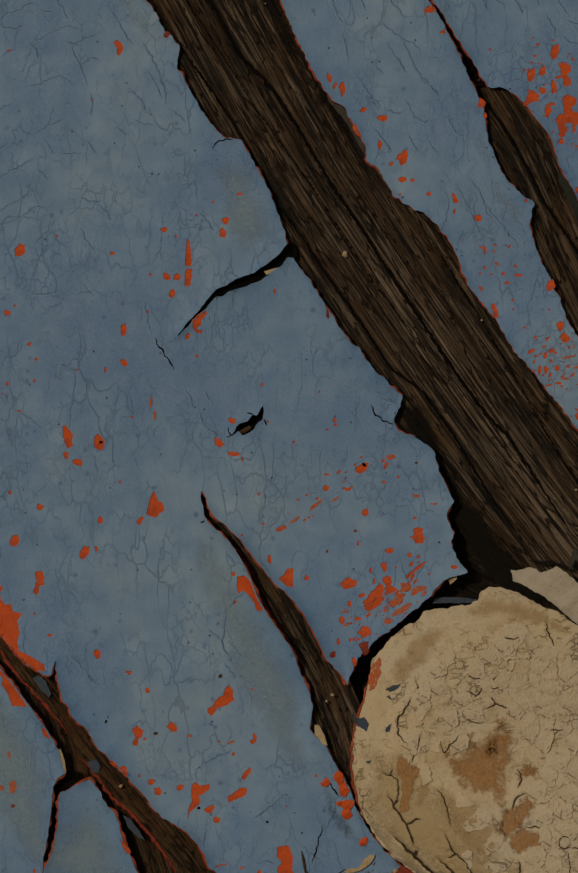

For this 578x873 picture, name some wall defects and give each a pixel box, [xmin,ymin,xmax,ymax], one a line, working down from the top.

crack [143,0,578,542]
peeling [146,0,578,704]
peeling [136,492,164,525]
peeling [0,586,45,673]
peeling [0,670,27,707]
peeling [207,685,234,716]
crack [440,637,520,753]
peeling [176,782,221,823]
crack [383,681,472,873]
crack [512,769,527,809]
peeling [277,845,294,873]
crack [525,813,578,873]